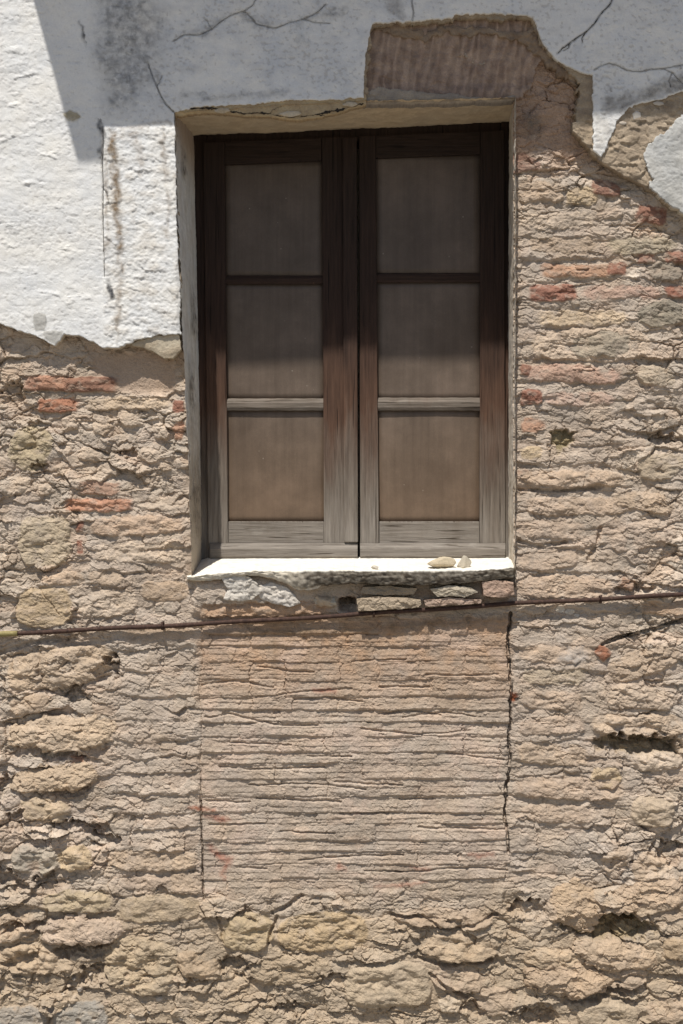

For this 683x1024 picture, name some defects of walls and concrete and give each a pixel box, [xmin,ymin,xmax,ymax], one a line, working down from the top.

crack [173,1,330,41]
crack [558,0,612,53]
spalling [174,20,578,123]
crack [594,63,683,87]
crack [156,77,364,118]
peeling [592,92,683,196]
water stain [98,119,122,249]
peeling [33,313,62,342]
spalling [214,575,320,607]
spalling [356,580,514,611]
crack [495,611,518,851]